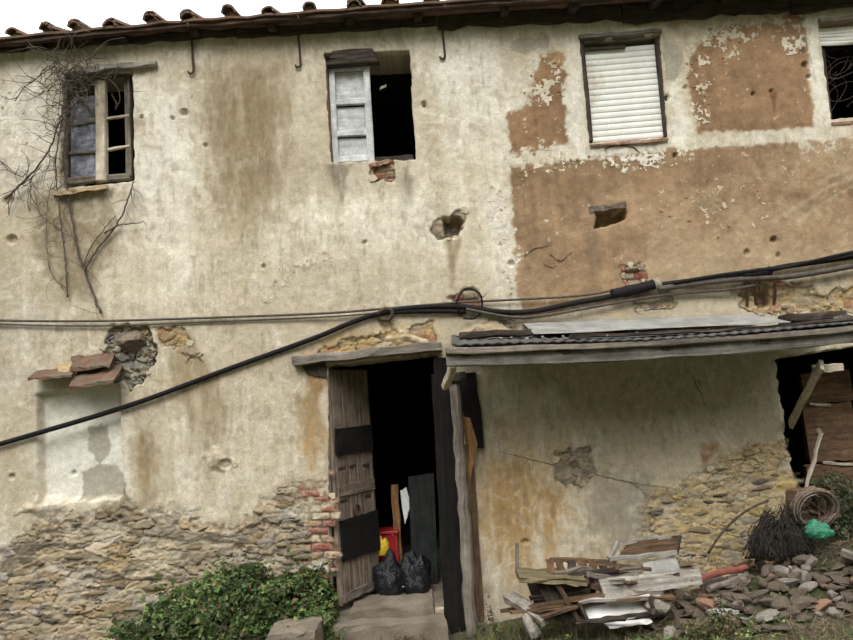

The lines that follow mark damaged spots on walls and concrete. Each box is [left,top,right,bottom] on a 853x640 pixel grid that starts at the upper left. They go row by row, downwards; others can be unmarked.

peeling [781,35,806,55]
peeling [522,56,565,107]
peeling [684,22,761,126]
spalling [368,160,395,182]
peeling [606,145,681,173]
spalling [430,206,469,241]
spalling [620,261,648,286]
spalling [731,280,853,316]
spalling [28,321,194,391]
spalling [553,446,599,489]
spalling [639,439,803,578]
spalling [0,470,342,640]